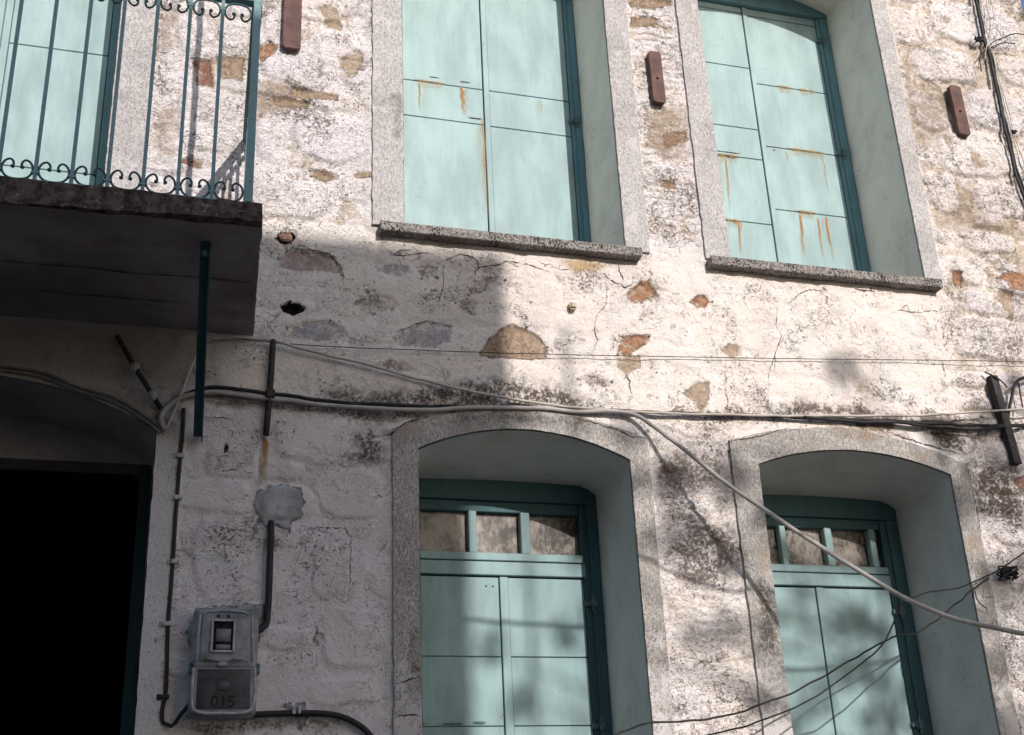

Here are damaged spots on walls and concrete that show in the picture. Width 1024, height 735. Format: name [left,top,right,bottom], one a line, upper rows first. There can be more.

rust [797,211,831,244]
crack [383,243,568,342]
spalling [627,280,657,303]
spalling [689,295,714,308]
spalling [280,300,347,343]
spalling [480,325,549,360]
spalling [617,334,651,371]